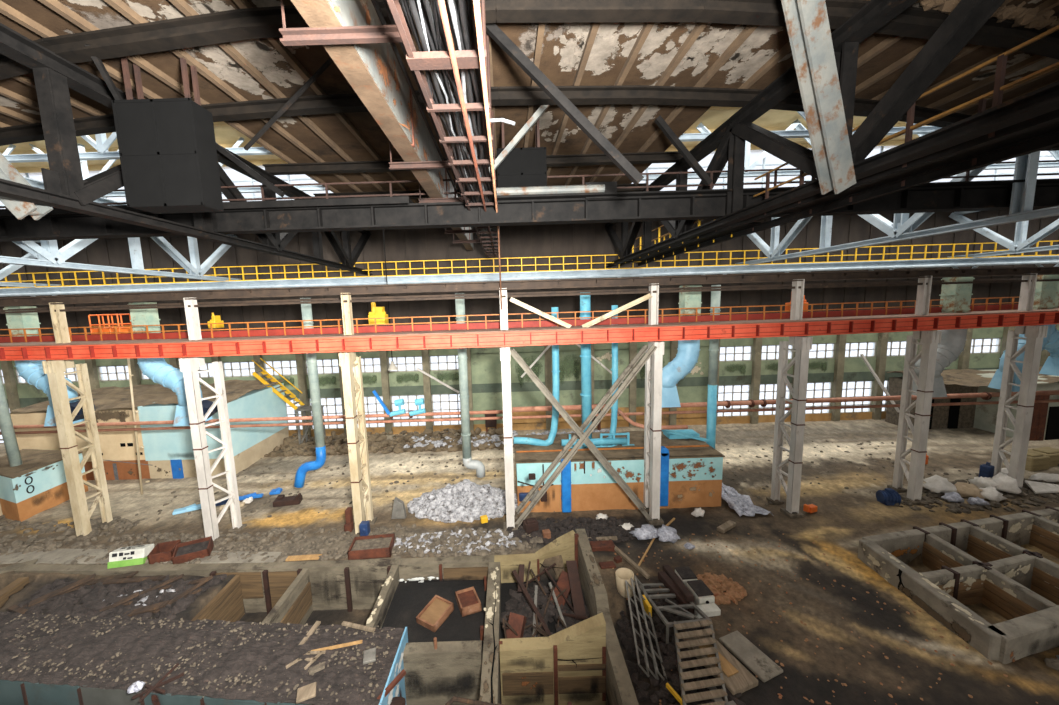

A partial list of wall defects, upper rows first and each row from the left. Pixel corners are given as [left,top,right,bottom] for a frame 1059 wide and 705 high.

peeling [66,0,235,30]
spalling [912,0,961,14]
spalling [990,0,1059,31]
peeling [182,37,310,99]
peeling [519,22,792,86]
peeling [530,104,660,143]
rust [608,461,641,482]
rust [669,459,716,480]